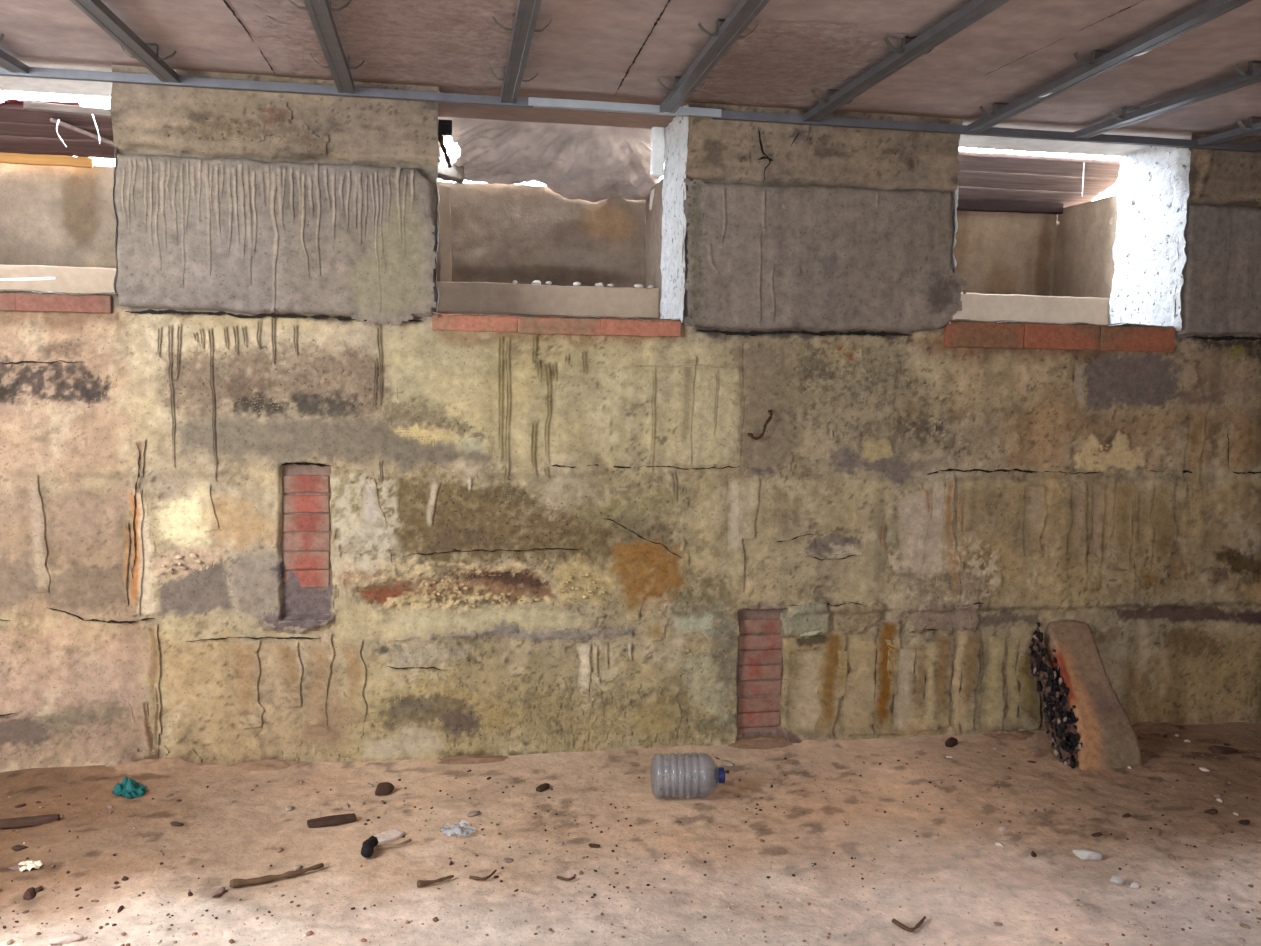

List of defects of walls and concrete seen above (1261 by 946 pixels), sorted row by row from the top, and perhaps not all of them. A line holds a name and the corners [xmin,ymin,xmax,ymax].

crack [614,0,671,97]
water stain [0,334,121,409]
water stain [120,101,1046,764]
crack [927,467,1104,475]
crack [1227,433,1261,474]
crack [49,608,155,624]
crack [186,635,319,643]
rust [814,631,848,739]
rust [873,620,900,735]
water stain [0,694,135,754]